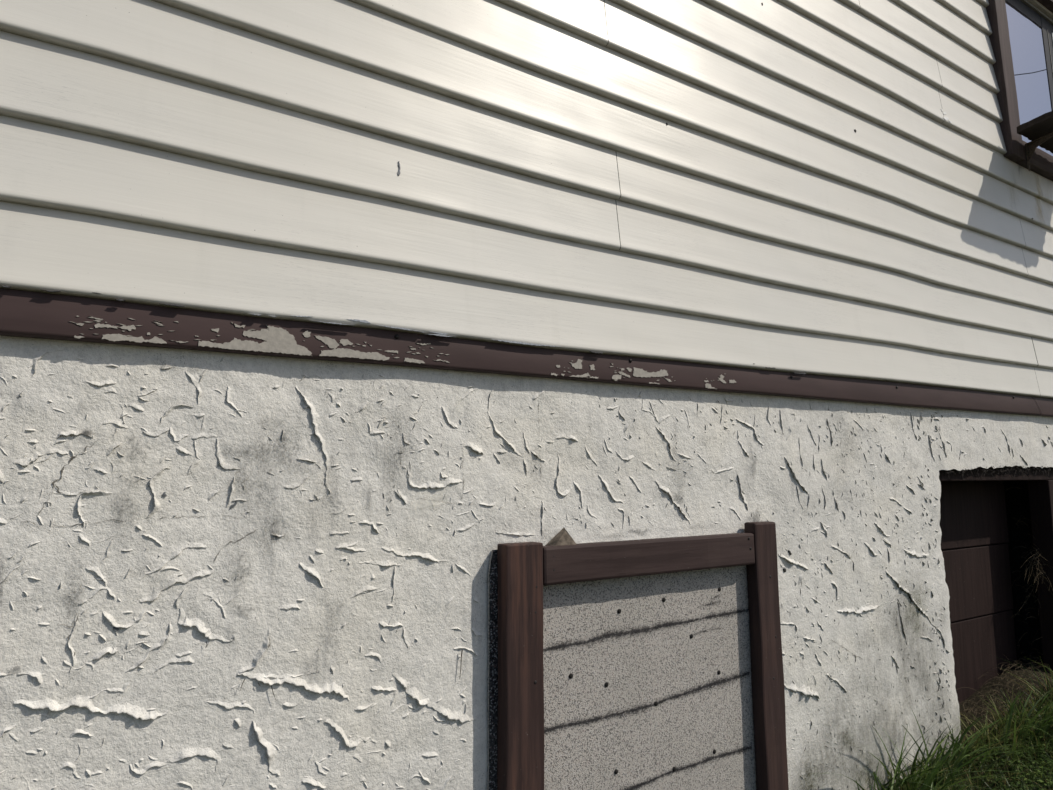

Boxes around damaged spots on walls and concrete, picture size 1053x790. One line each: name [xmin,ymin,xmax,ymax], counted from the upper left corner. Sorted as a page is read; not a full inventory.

peeling [69,314,453,364]
peeling [551,351,602,379]
peeling [610,363,675,384]
peeling [704,374,736,389]